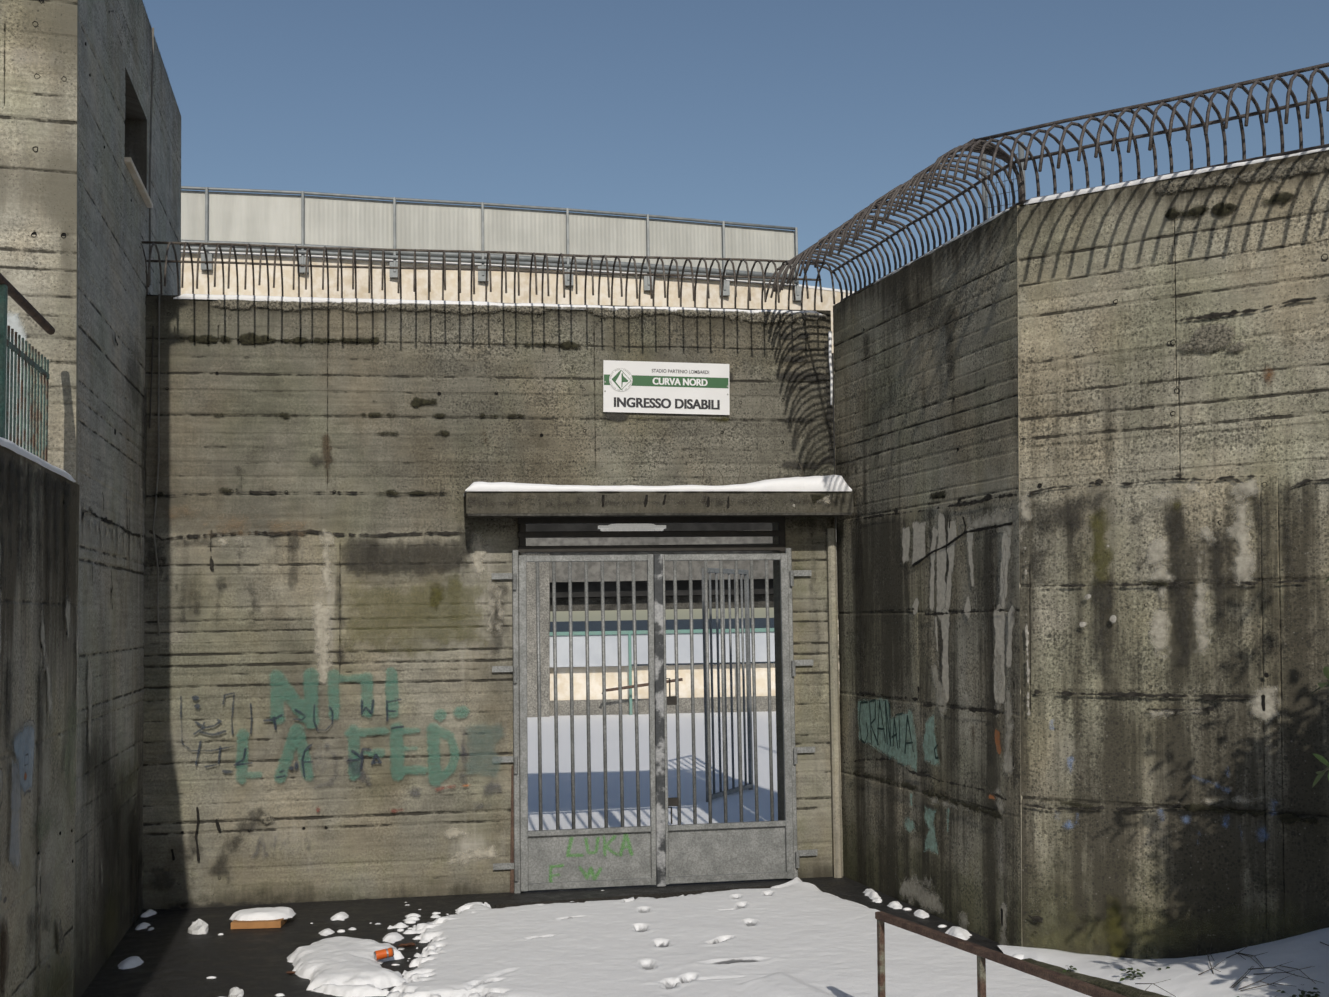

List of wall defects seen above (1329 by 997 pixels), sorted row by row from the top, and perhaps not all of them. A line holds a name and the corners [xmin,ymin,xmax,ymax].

water stain [38,621,52,847]
water stain [0,458,163,777]
water stain [902,511,1016,773]
water stain [1033,494,1102,576]
water stain [1139,497,1270,663]
peeling [1233,479,1257,494]